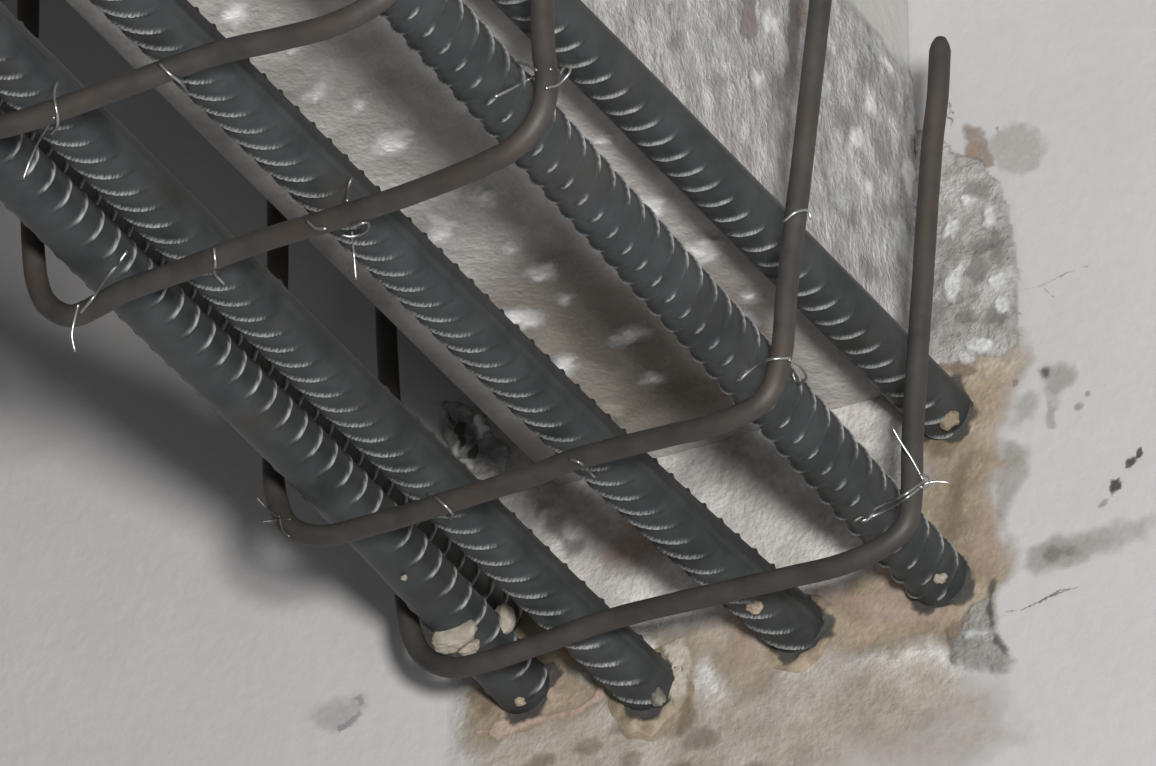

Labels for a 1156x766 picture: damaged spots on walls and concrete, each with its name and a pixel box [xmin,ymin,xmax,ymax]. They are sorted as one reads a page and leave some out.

spalling [581,0,809,207]
spalling [806,0,922,333]
peeling [428,229,450,244]
peeling [507,313,522,324]
spalling [929,142,1019,366]
flaking render [442,401,534,480]
spalling [499,479,702,608]
spalling [657,429,862,569]
spalling [798,568,868,603]
spalling [831,396,902,489]
damp [1031,537,1100,568]
spalling [456,580,1012,766]